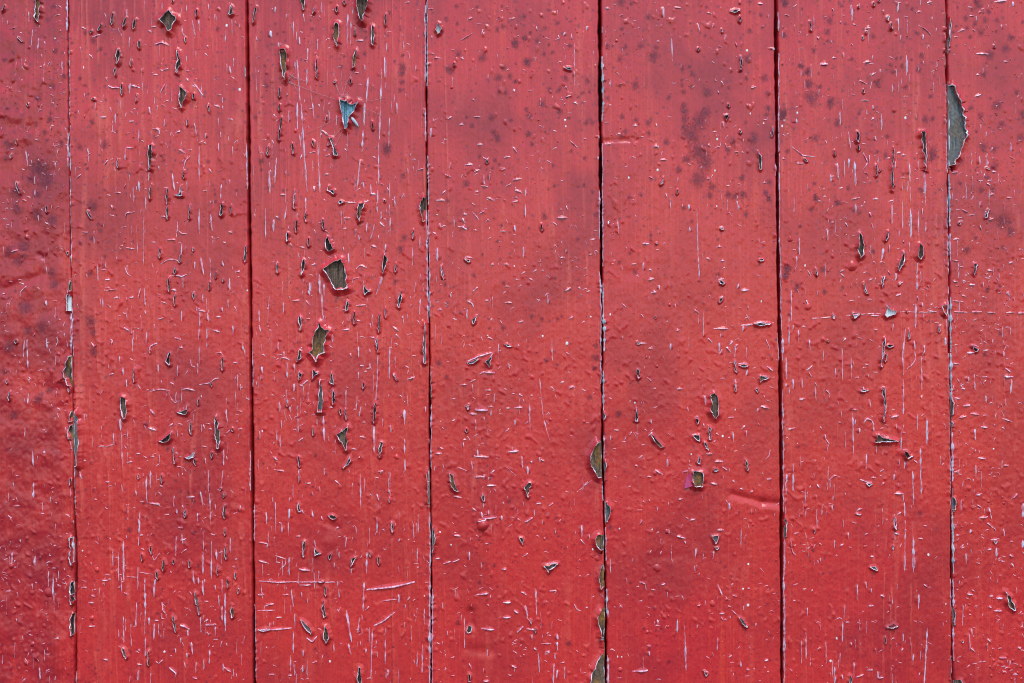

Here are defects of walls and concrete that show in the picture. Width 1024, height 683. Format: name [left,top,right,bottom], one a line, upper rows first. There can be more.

peeling [154,0,196,125]
peeling [312,0,387,160]
peeling [59,0,90,515]
peeling [284,184,374,324]
peeling [942,80,973,274]
peeling [294,312,354,470]
peeling [684,387,724,492]
peeling [582,435,615,683]